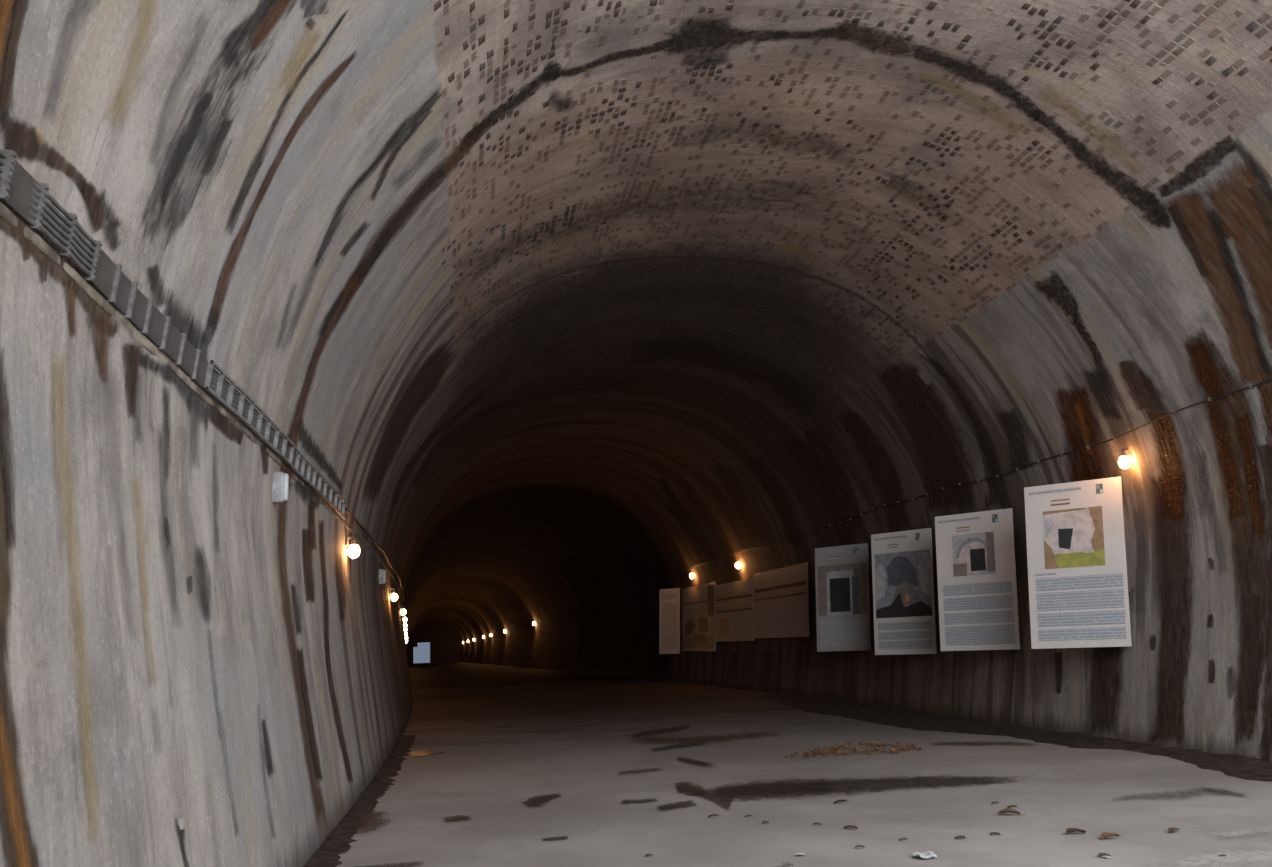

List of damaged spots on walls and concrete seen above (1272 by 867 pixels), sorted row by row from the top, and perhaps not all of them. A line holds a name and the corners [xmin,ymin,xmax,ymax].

rust [0,0,29,129]
leakage [227,12,348,231]
crack [463,17,1272,228]
rust [0,200,141,417]
rust [0,349,39,867]
leakage [137,352,244,639]
leakage [261,445,269,473]
rust [1055,360,1192,741]
rust [1168,160,1272,761]